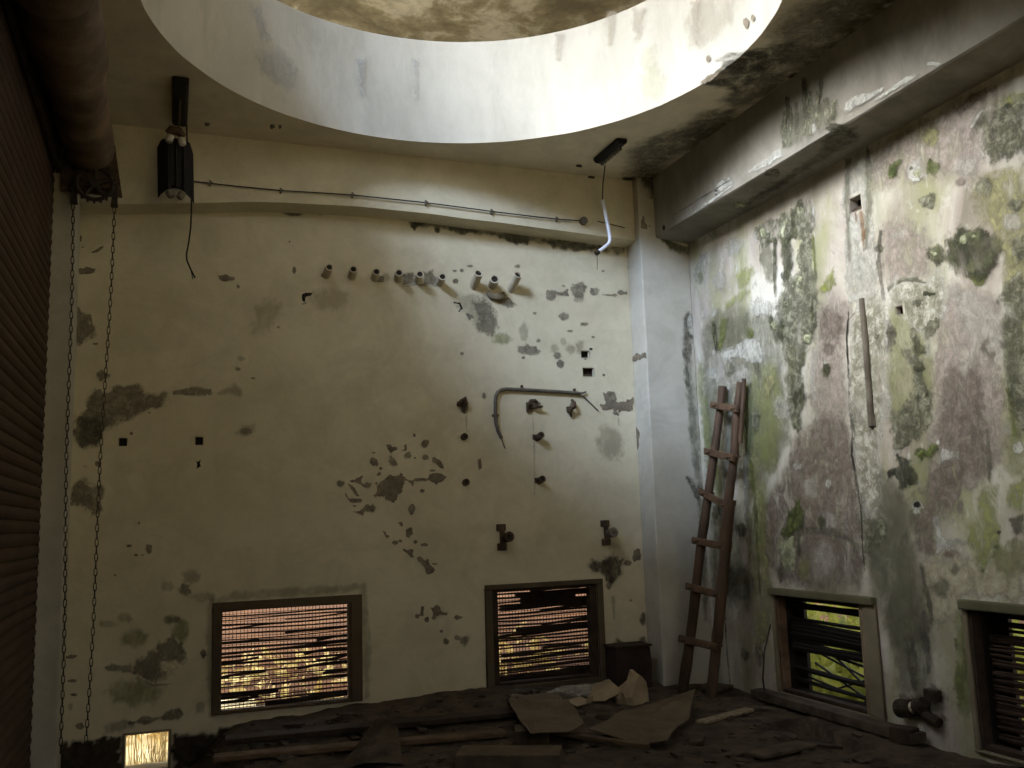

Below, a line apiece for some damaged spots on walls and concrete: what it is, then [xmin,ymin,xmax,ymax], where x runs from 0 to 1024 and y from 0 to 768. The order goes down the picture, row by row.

damp [622,0,941,302]
damp [970,93,1024,165]
damp [410,222,624,254]
peeling [454,295,515,343]
damp [981,270,1024,463]
peeling [600,391,634,416]
peeling [337,434,446,515]
damp [683,297,967,696]
crack [846,311,865,570]
peeling [383,504,437,574]
peeling [415,605,469,645]